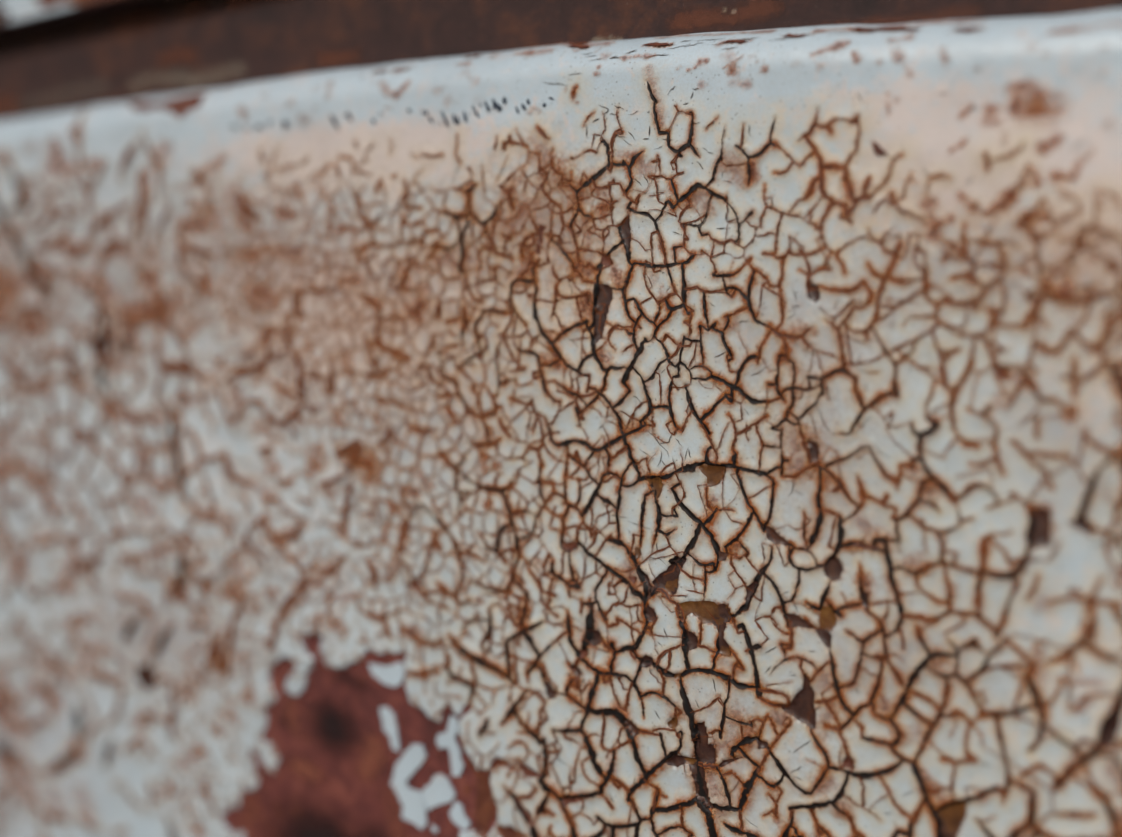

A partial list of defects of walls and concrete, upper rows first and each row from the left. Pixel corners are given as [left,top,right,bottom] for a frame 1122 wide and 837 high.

rust [0,0,1122,121]
rust [1038,136,1062,153]
crack [2,327,276,393]
crack [164,398,190,506]
crack [273,81,1122,837]
crack [121,552,225,676]
peeling [219,634,542,837]